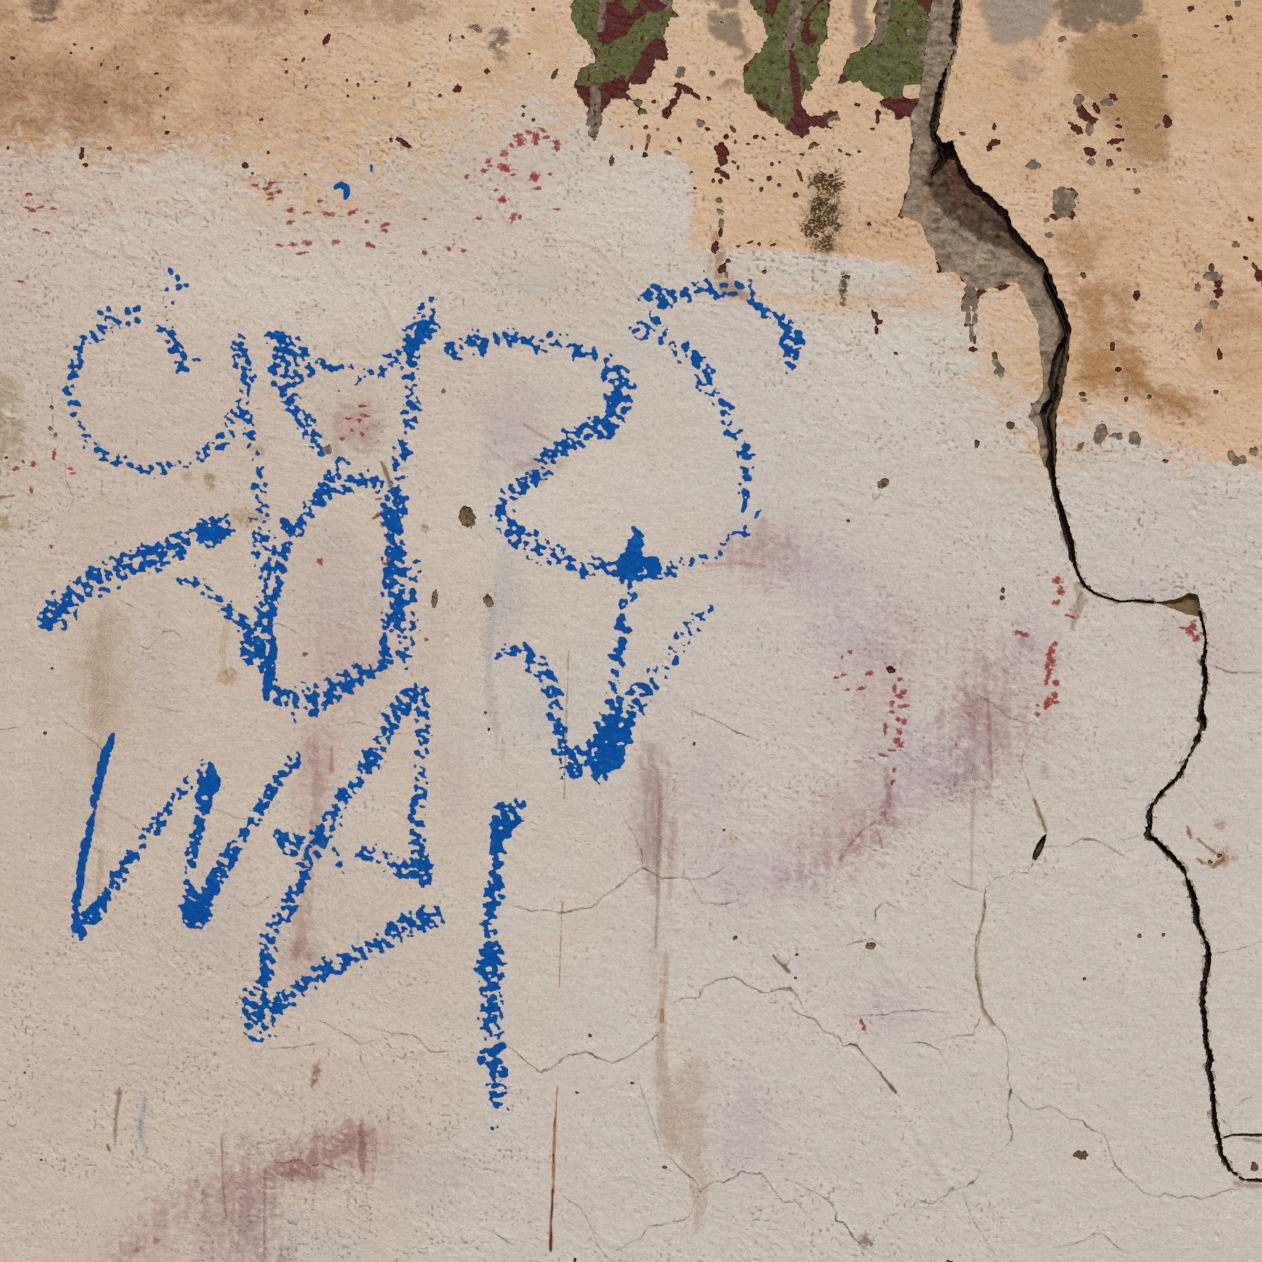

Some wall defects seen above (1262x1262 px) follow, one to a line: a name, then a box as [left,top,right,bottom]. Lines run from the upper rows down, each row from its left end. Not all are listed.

peeling [569,0,712,158]
crack [930,0,961,173]
peeling [696,0,840,278]
peeling [1068,93,1141,195]
flaking render [838,0,1072,474]
peeling [1043,186,1079,238]
peeling [1194,263,1224,333]
peeling [1231,241,1262,285]
peeling [1076,421,1141,451]
peeling [1227,446,1258,466]
crack [1039,270,1262,1184]
crack [1032,834,1047,861]